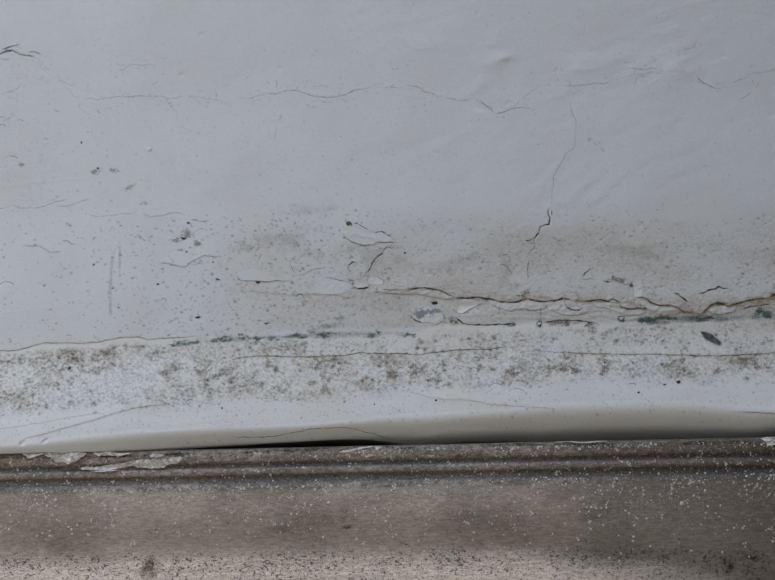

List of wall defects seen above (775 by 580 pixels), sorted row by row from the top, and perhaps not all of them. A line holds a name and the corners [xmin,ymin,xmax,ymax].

crack [0,45,41,60]
crack [525,210,552,271]
water stain [637,315,675,324]
peeling [22,451,130,464]